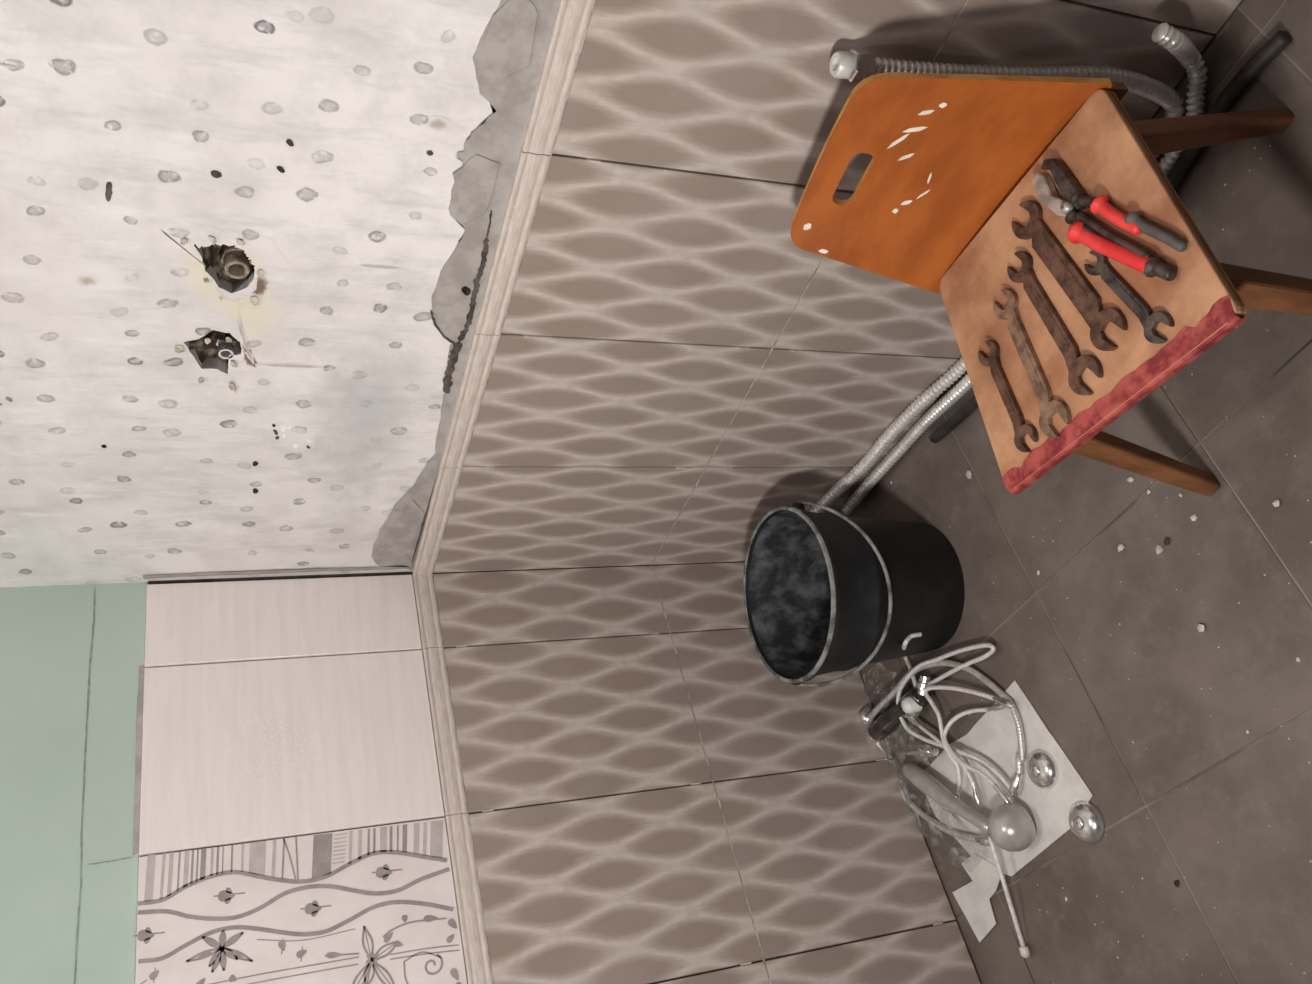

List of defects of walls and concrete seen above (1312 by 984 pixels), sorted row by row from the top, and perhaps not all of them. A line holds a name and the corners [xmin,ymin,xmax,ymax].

flaking render [180,236,264,284]
flaking render [175,330,248,390]